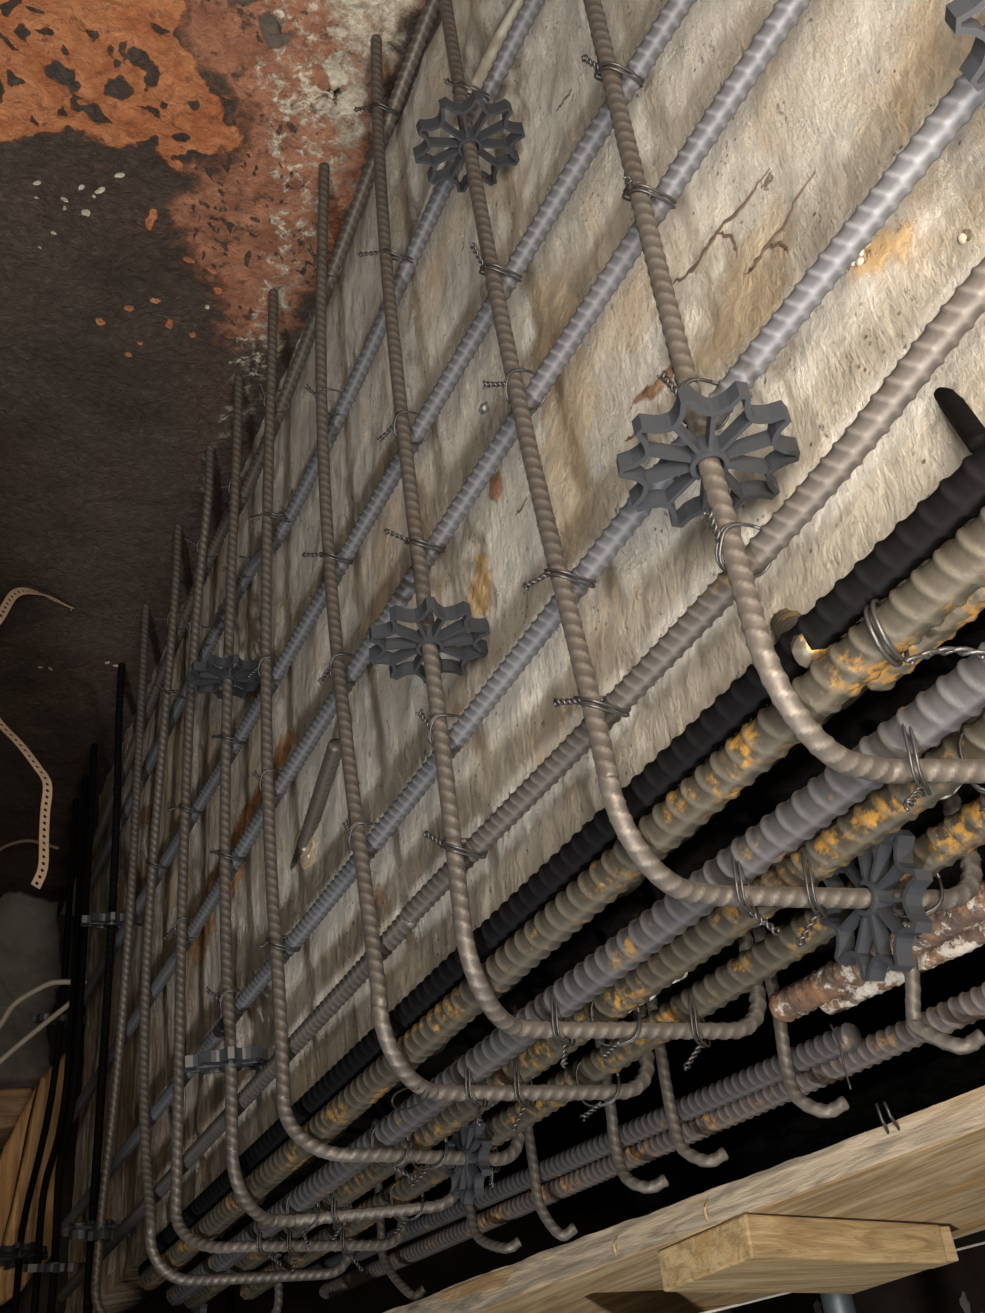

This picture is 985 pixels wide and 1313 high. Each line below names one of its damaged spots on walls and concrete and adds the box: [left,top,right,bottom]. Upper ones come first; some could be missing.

peeling [0,0,243,172]
spalling [620,0,697,105]
spalling [650,0,811,228]
spalling [525,221,642,416]
crack [672,168,816,285]
spalling [84,0,613,1006]
spalling [73,411,518,1123]